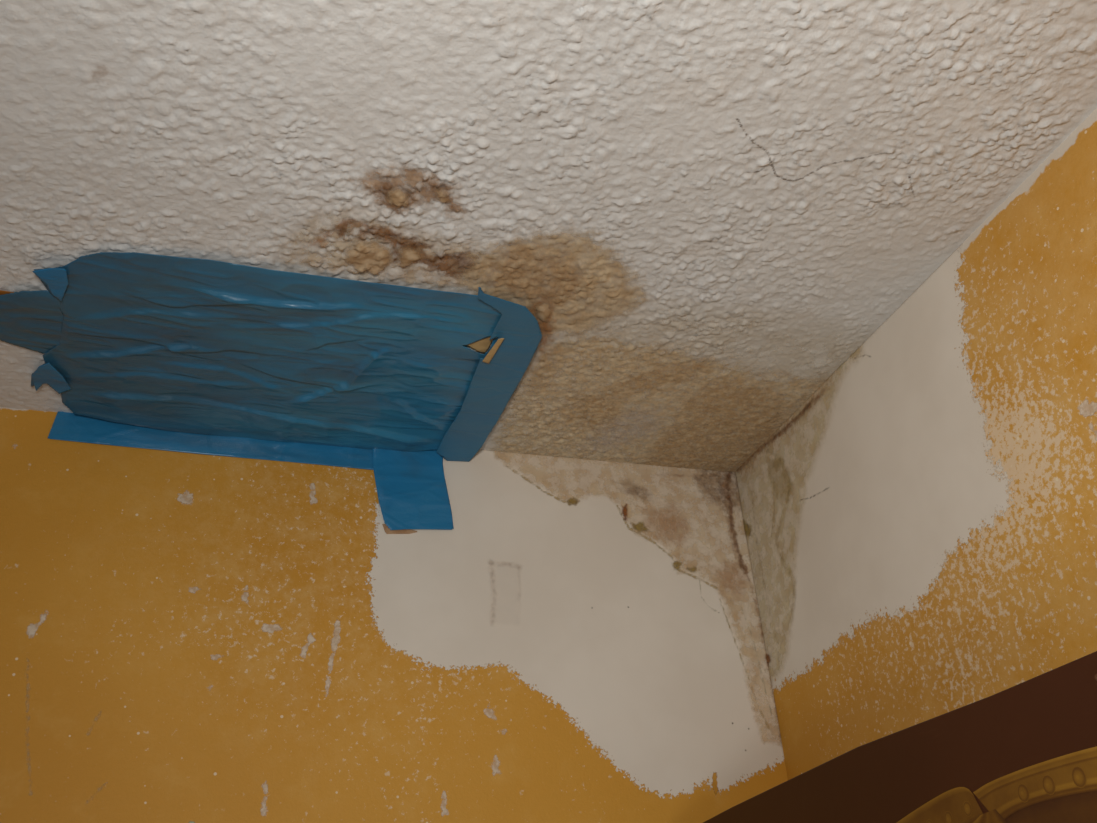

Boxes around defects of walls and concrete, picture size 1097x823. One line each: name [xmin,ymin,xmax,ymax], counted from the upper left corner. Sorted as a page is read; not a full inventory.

water stain [362,169,465,212]
water stain [303,222,834,742]
peeling [365,244,1016,799]